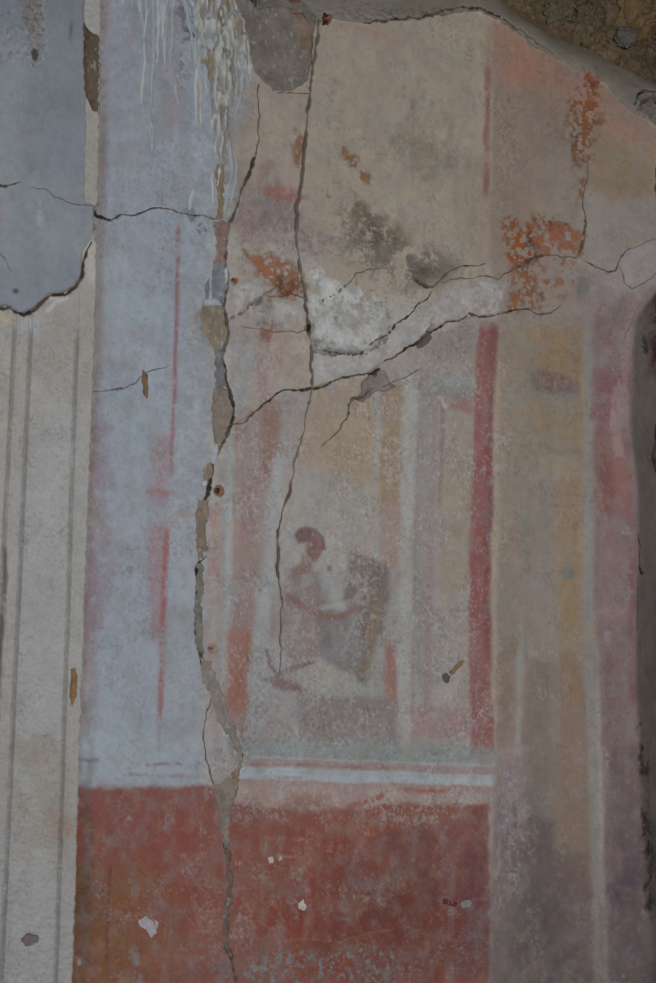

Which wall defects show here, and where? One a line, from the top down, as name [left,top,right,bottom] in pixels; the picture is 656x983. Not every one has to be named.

crack [364,5,554,54]
spalling [82,23,101,111]
leakage [120,0,254,220]
crack [634,89,656,106]
crack [30,187,95,207]
crack [0,242,92,316]
crack [585,238,656,289]
crack [93,20,588,983]
crack [636,533,645,630]